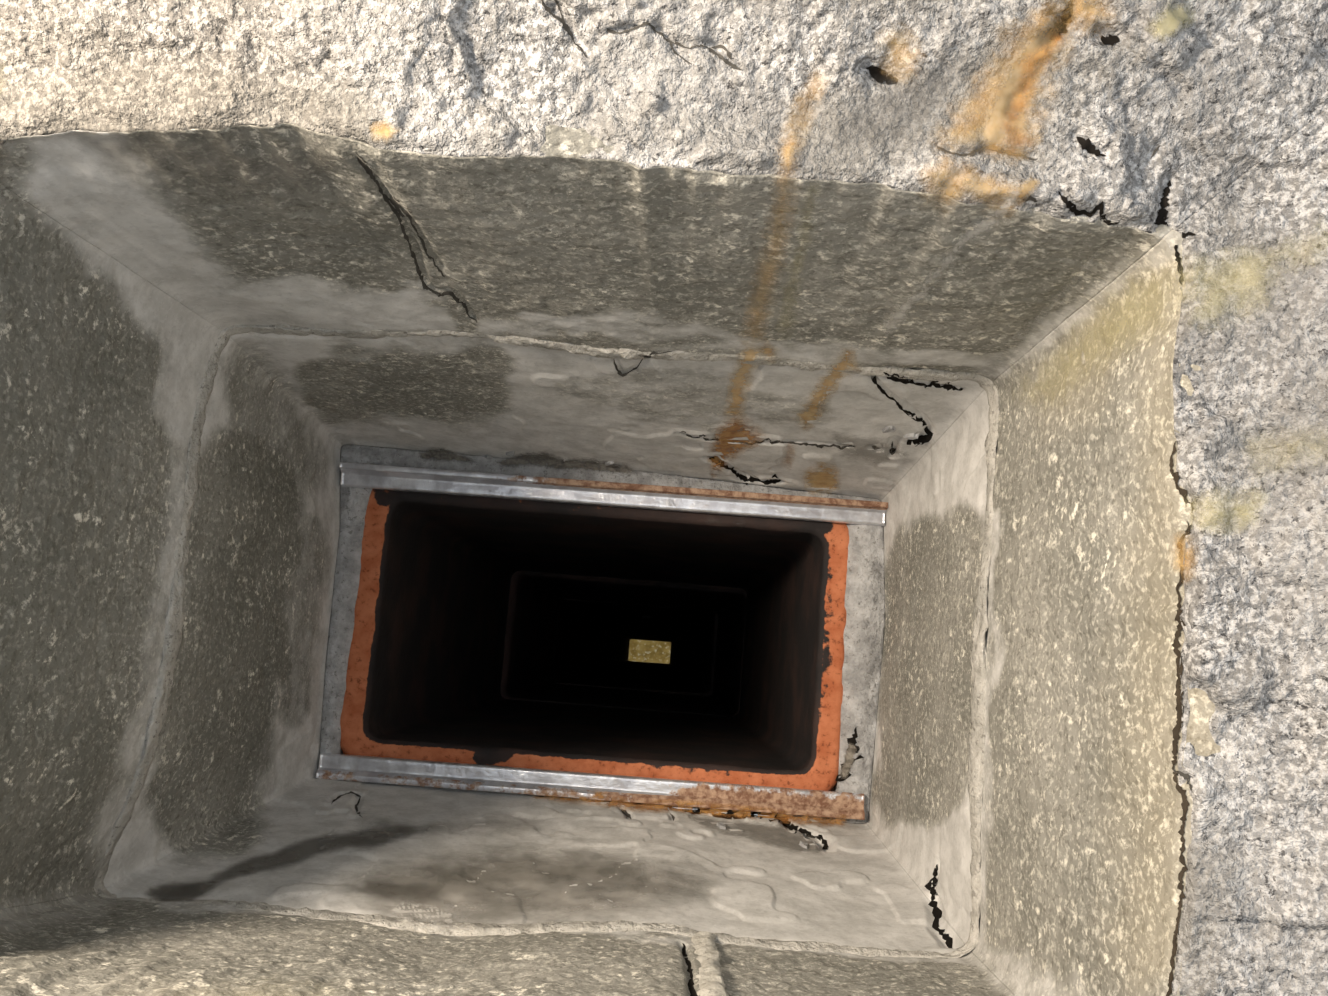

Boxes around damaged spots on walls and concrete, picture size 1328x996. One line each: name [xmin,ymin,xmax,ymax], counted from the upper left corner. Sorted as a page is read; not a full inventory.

crack [541,0,742,70]
crack [356,153,477,323]
corrosion [711,348,771,470]
crack [680,372,963,486]
crack [1166,441,1194,996]
corrosion [535,792,843,825]
water stain [153,827,414,899]
crack [925,865,953,949]
crack [682,943,698,996]